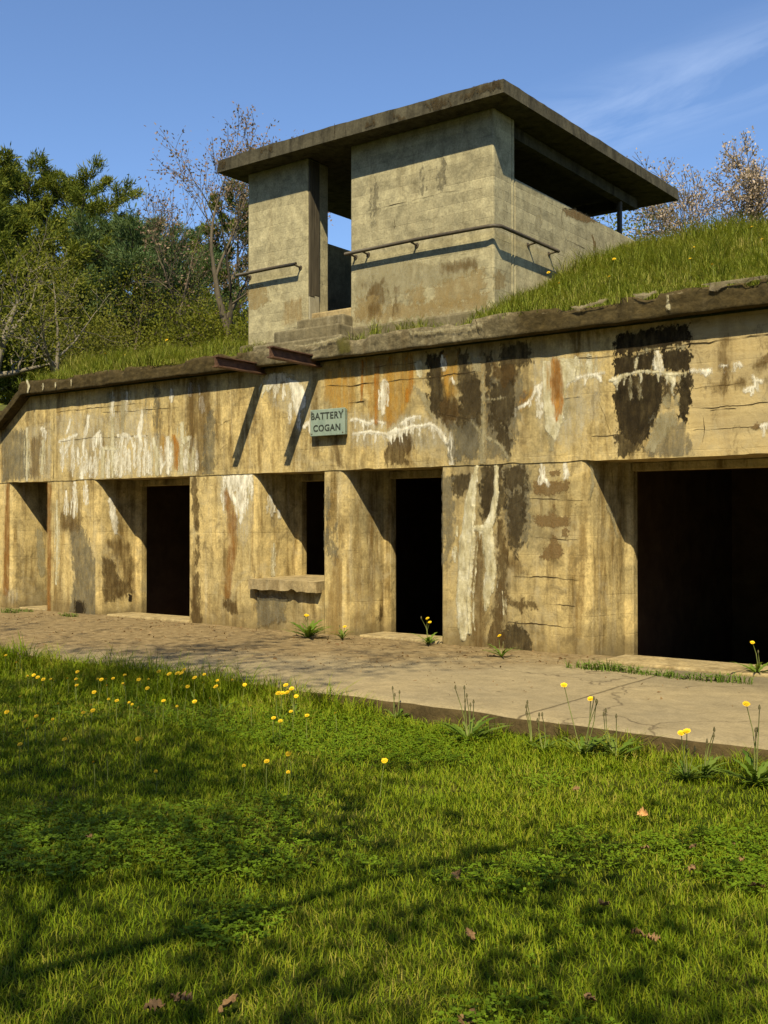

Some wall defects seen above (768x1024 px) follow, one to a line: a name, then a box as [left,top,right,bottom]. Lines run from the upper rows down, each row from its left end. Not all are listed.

rust [325,354,413,424]
rust [519,356,577,440]
water stain [609,322,768,458]
water stain [1,377,254,623]
rust [225,491,236,598]
water stain [350,340,549,651]